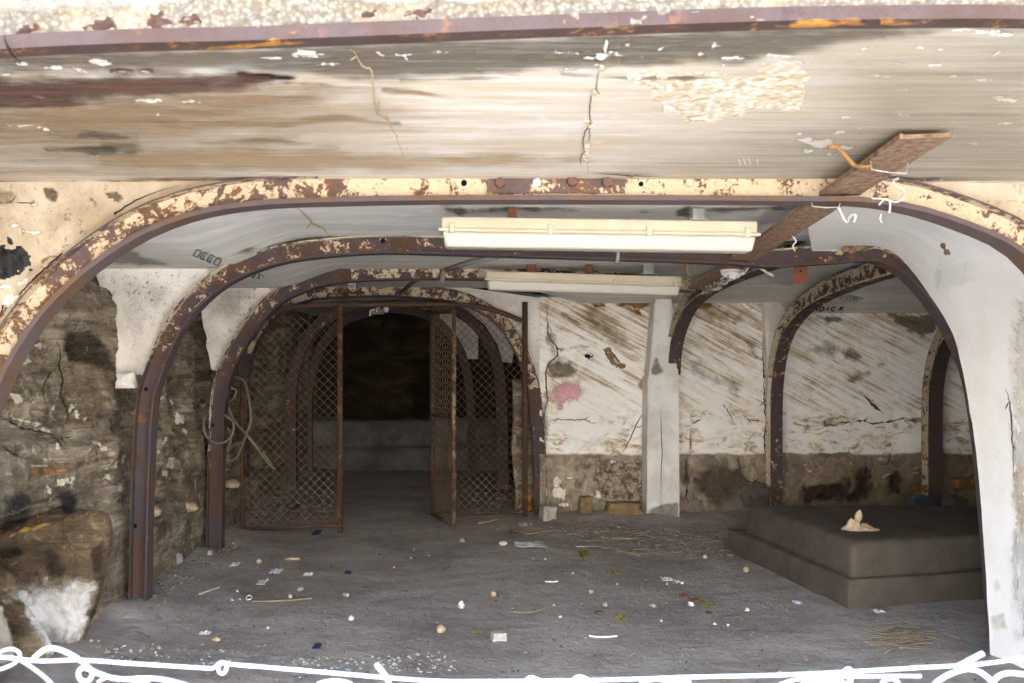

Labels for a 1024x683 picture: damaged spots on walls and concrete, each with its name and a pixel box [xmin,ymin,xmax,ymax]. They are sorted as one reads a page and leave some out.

corrosion [207,31,300,50]
peeling [261,49,339,66]
corrosion [777,19,865,28]
spalling [626,42,813,125]
crack [580,71,659,179]
peeling [0,269,33,307]
corrosion [594,303,650,315]
crack [544,306,598,432]
crack [815,396,920,427]
damp [684,466,748,504]
damp [802,468,871,503]
damp [888,470,902,494]